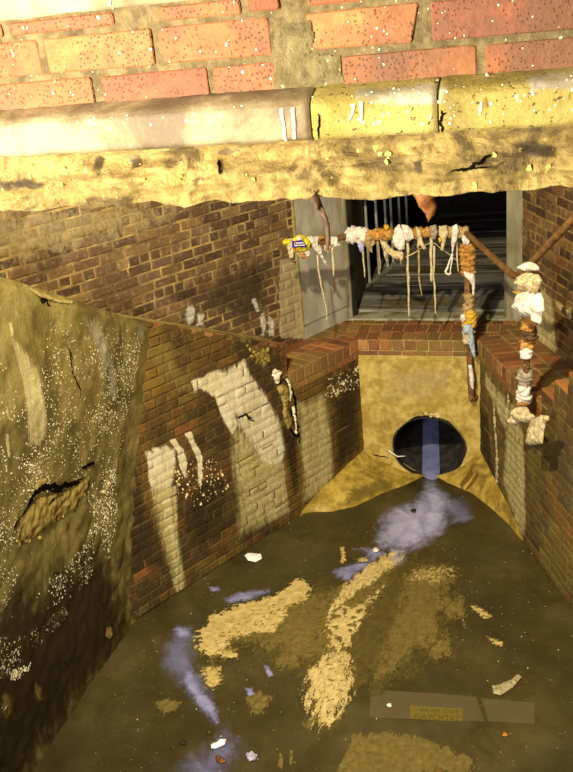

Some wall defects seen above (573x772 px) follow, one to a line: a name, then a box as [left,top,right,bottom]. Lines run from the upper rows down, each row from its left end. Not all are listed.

crack [450,154,493,172]
damp [9,323,46,445]
spalling [0,322,142,620]
crack [67,346,81,395]
damp [131,432,224,592]
damp [191,361,358,530]